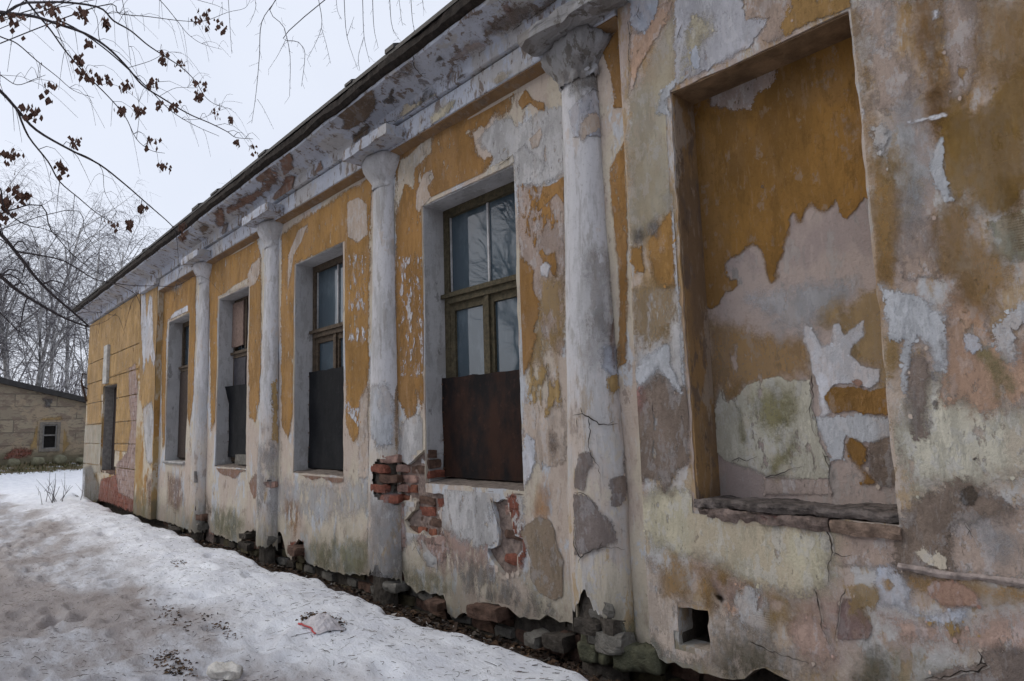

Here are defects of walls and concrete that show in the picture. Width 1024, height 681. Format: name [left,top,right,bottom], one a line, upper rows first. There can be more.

peeling [603,0,915,309]
damp [864,126,896,277]
damp [916,0,1024,303]
peeling [87,275,196,512]
peeling [200,88,627,600]
crack [566,407,616,508]
damp [756,391,794,427]
peeling [602,137,1024,681]
crack [814,527,850,648]